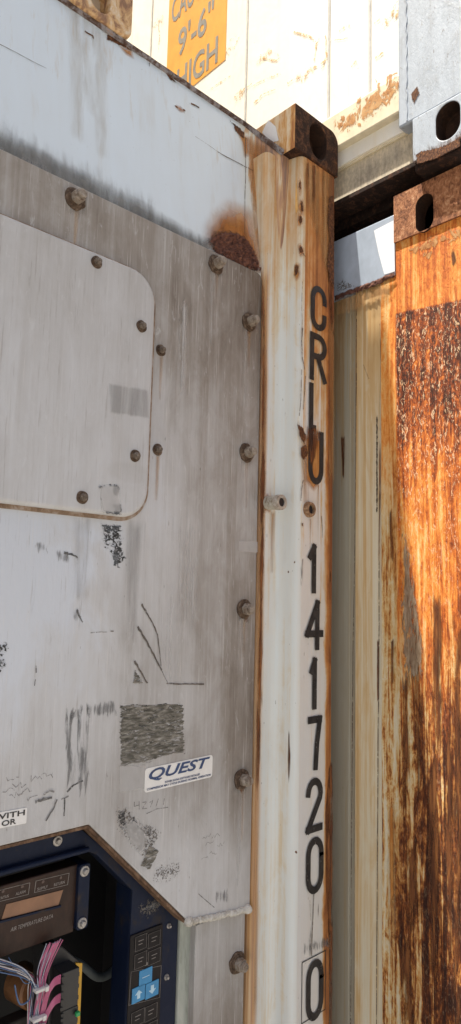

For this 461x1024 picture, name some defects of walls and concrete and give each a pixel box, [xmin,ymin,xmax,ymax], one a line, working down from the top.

corrosion [234,125,258,211]
corrosion [297,424,320,493]
corrosion [376,417,393,559]
corrosion [377,599,461,1024]